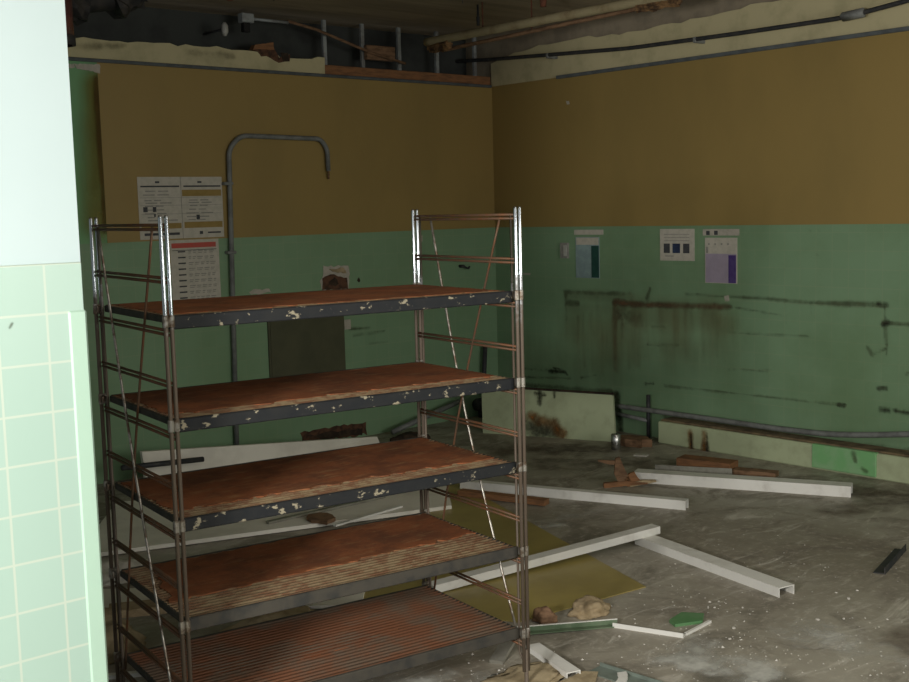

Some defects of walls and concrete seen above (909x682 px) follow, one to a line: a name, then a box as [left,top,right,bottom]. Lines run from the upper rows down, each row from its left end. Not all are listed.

rust [613,299,729,319]